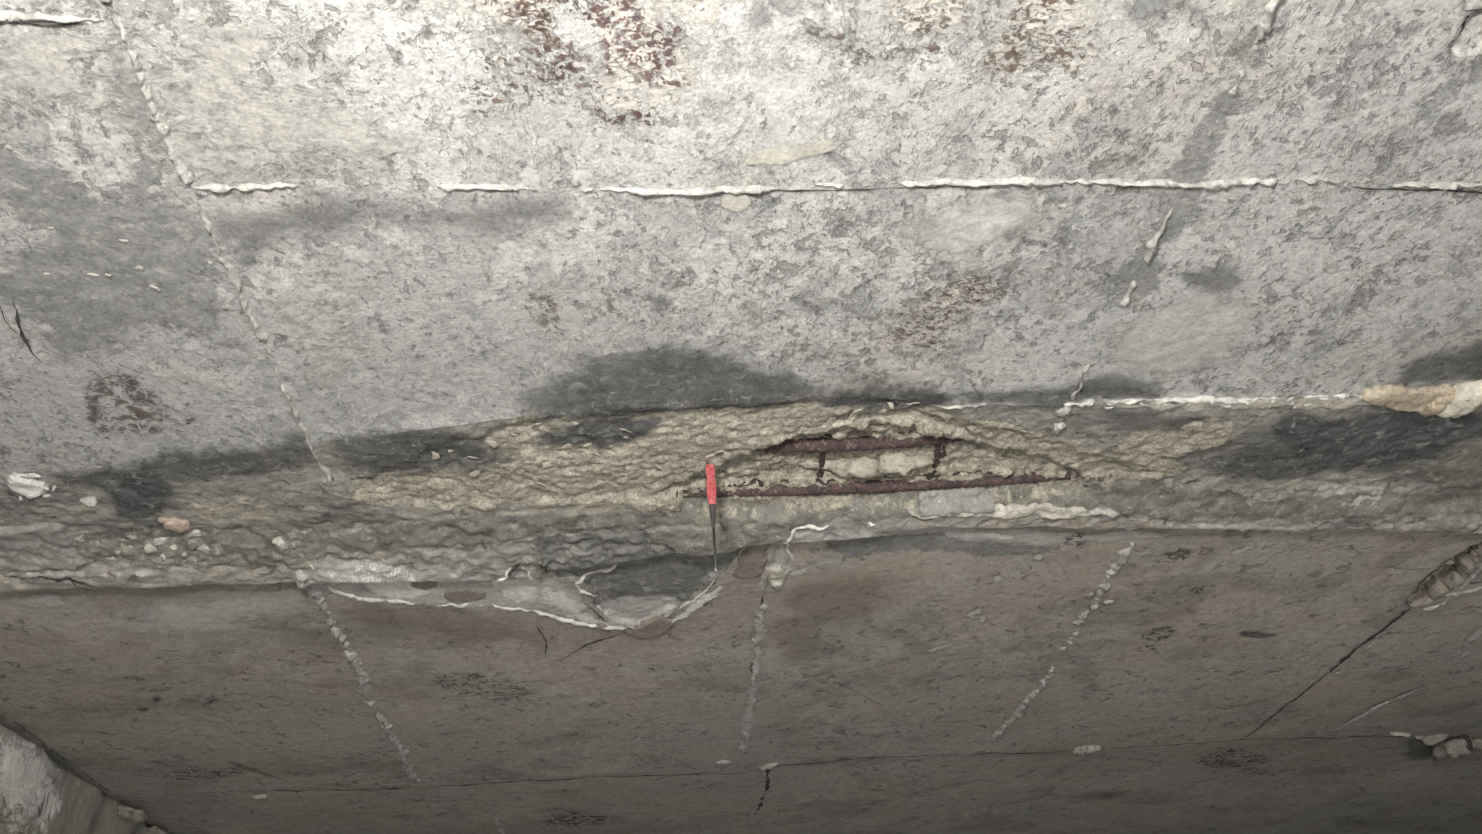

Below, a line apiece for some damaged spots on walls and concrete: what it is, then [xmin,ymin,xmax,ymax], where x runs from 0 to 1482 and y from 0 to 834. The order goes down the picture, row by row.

crack [773,185,963,193]
crack [1350,186,1482,194]
crack [0,284,42,362]
damp [530,342,1482,480]
spalling [347,394,1237,661]
spalling [1241,542,1482,740]
crack [754,769,770,815]